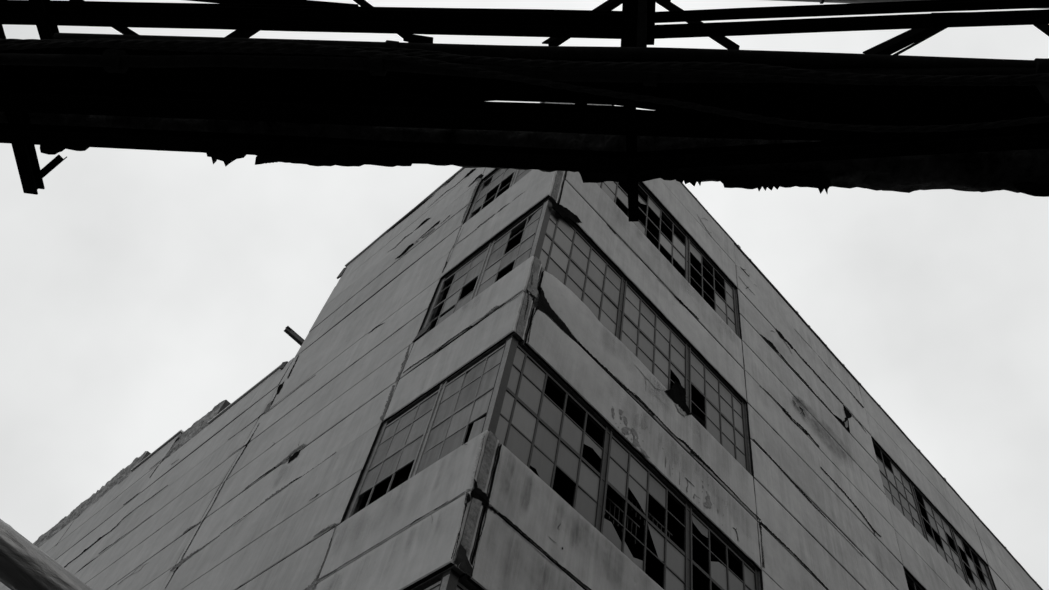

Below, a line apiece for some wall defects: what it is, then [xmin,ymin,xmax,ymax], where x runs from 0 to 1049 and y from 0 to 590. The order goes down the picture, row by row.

spalling [833,405,866,433]
spalling [246,444,305,488]